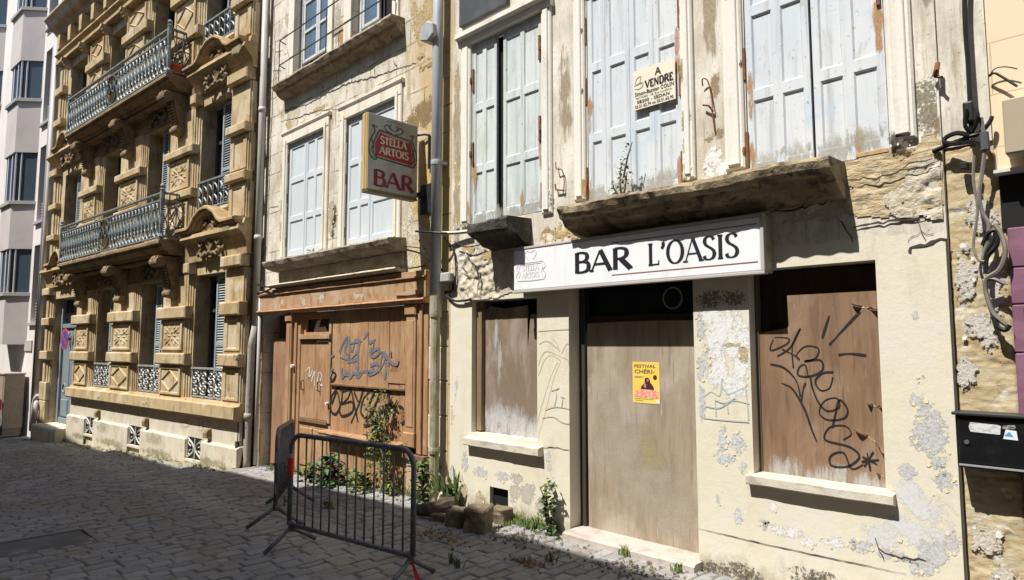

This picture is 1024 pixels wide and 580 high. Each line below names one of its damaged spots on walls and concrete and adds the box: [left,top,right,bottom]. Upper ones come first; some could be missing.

corrosion [872,2,883,50]
spalling [451,209,514,304]
spalling [842,131,944,220]
peeling [953,242,1007,352]
peeling [963,194,999,233]
peeling [694,298,750,421]
peeling [956,353,979,390]
peeling [450,451,544,520]
peeling [713,425,747,472]
peeling [759,375,1021,580]